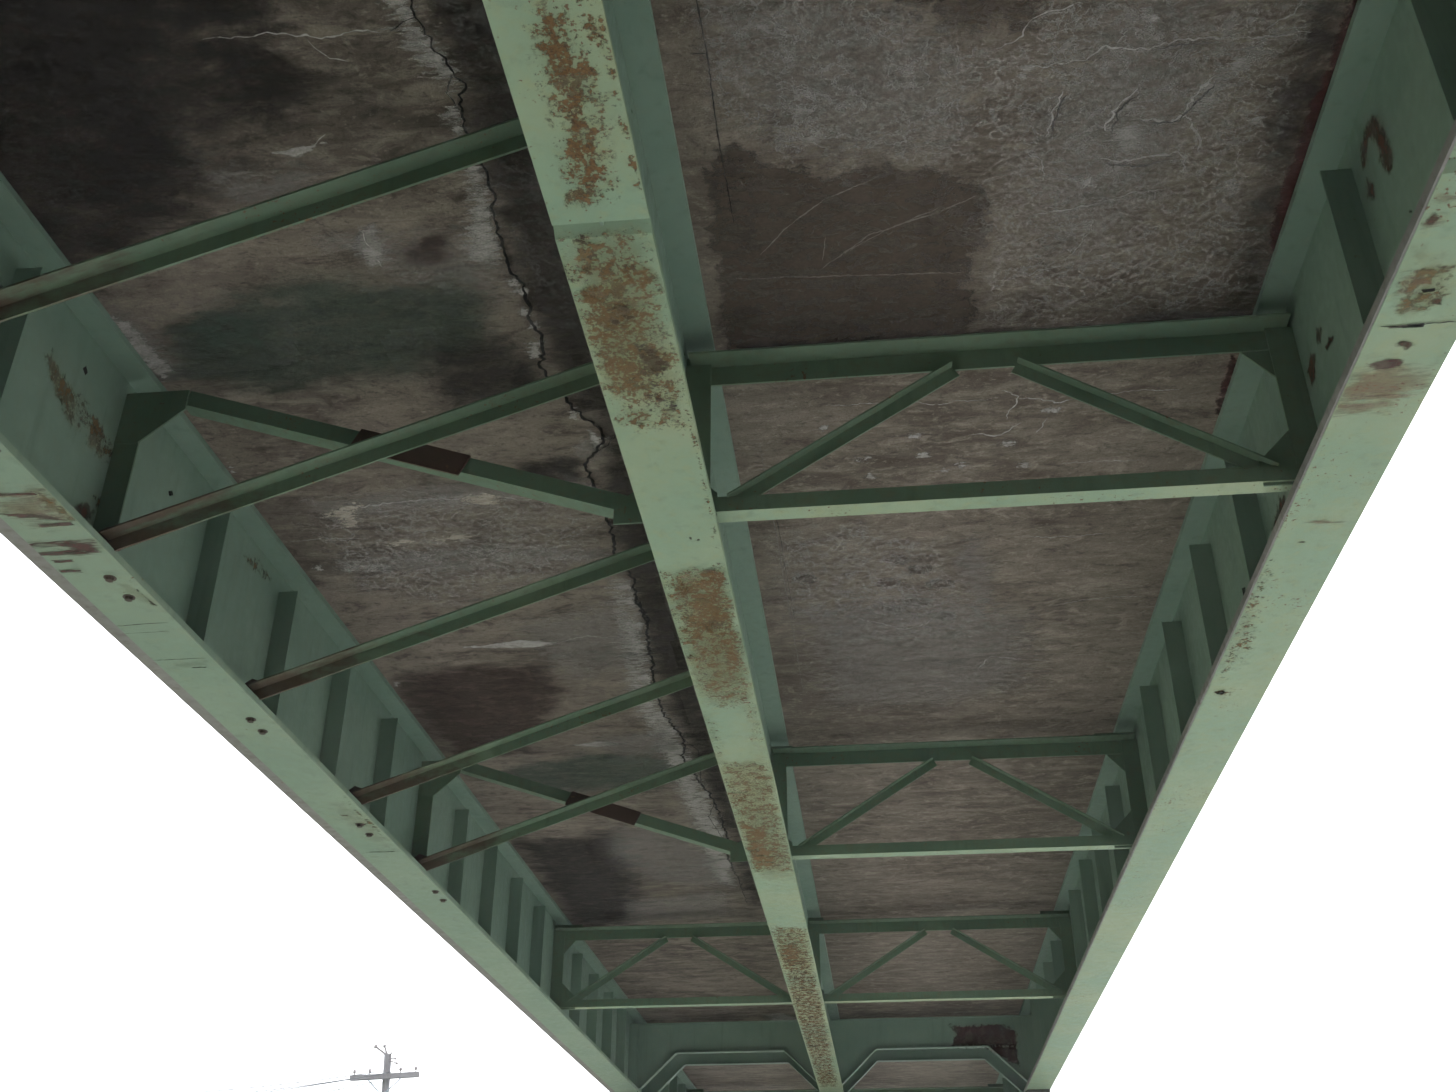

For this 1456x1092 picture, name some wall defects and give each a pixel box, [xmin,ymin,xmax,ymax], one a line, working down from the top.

damp [0,0,518,267]
damp [436,149,593,401]
crack [386,0,747,902]
corrosion [531,0,642,208]
damp [570,385,633,496]
corrosion [560,230,792,872]
damp [702,0,1339,350]
crack [996,2,1305,264]
corrosion [1266,0,1357,266]
corrosion [1343,266,1455,413]
damp [394,561,760,905]
corrosion [950,1023,1020,1067]